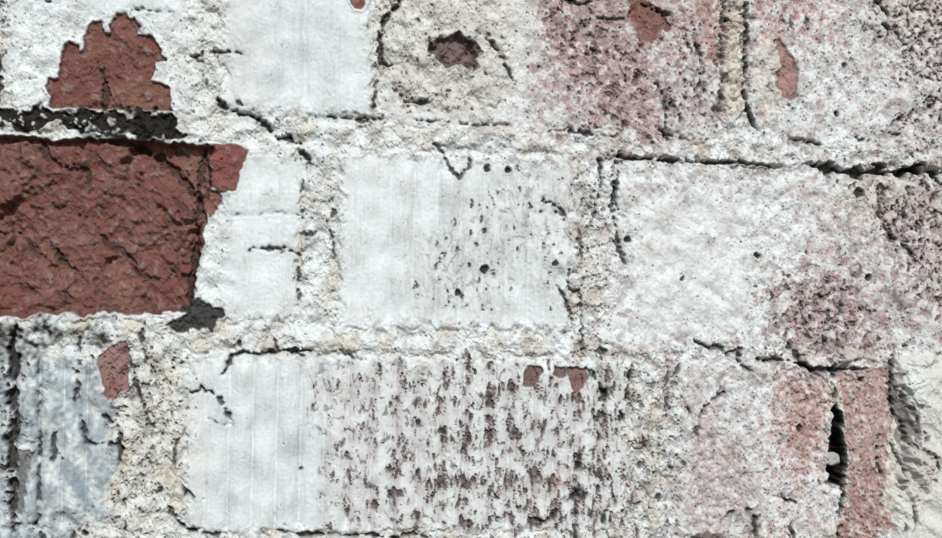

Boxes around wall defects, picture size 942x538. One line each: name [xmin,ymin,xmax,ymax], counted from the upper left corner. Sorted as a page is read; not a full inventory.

crack [6,225,89,284]
peeling [42,9,176,114]
spalling [0,132,253,538]
crack [0,316,369,538]
crack [23,0,519,316]
crack [266,520,434,538]
peeling [280,0,942,538]
crack [523,0,942,538]